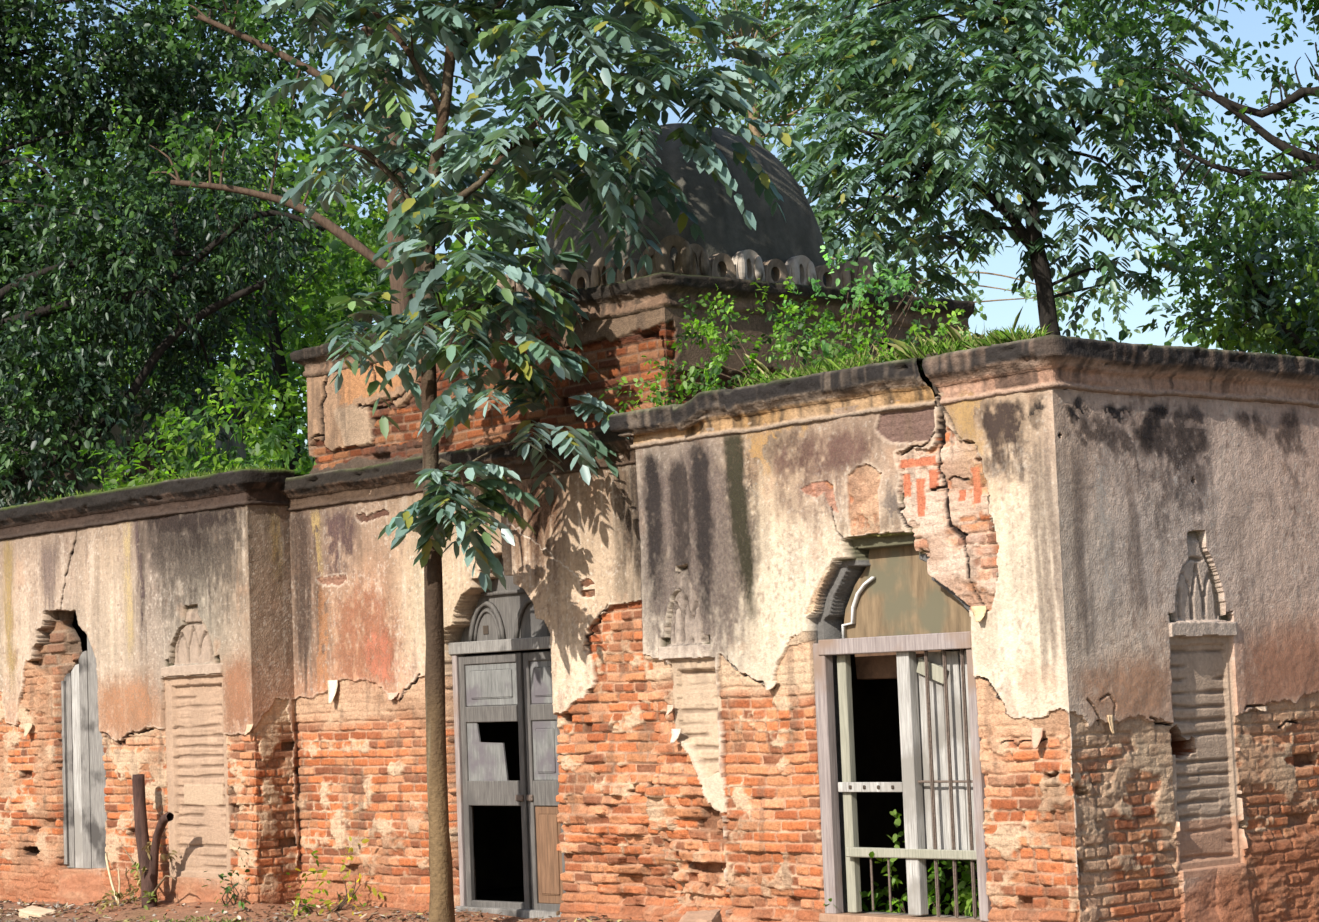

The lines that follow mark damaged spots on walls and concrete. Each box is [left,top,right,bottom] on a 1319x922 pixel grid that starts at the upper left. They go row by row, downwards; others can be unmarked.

flaking render [442,335,667,450]
leakage [619,435,753,646]
flaking render [878,401,999,622]
crack [899,352,999,604]
leakage [1239,412,1301,452]
flaking render [0,610,82,903]
flaking render [99,726,170,902]
flaking render [225,676,430,913]
flaking render [445,675,476,912]
flaking render [554,600,825,922]
flaking render [975,677,1186,922]
flaking render [1234,691,1319,837]